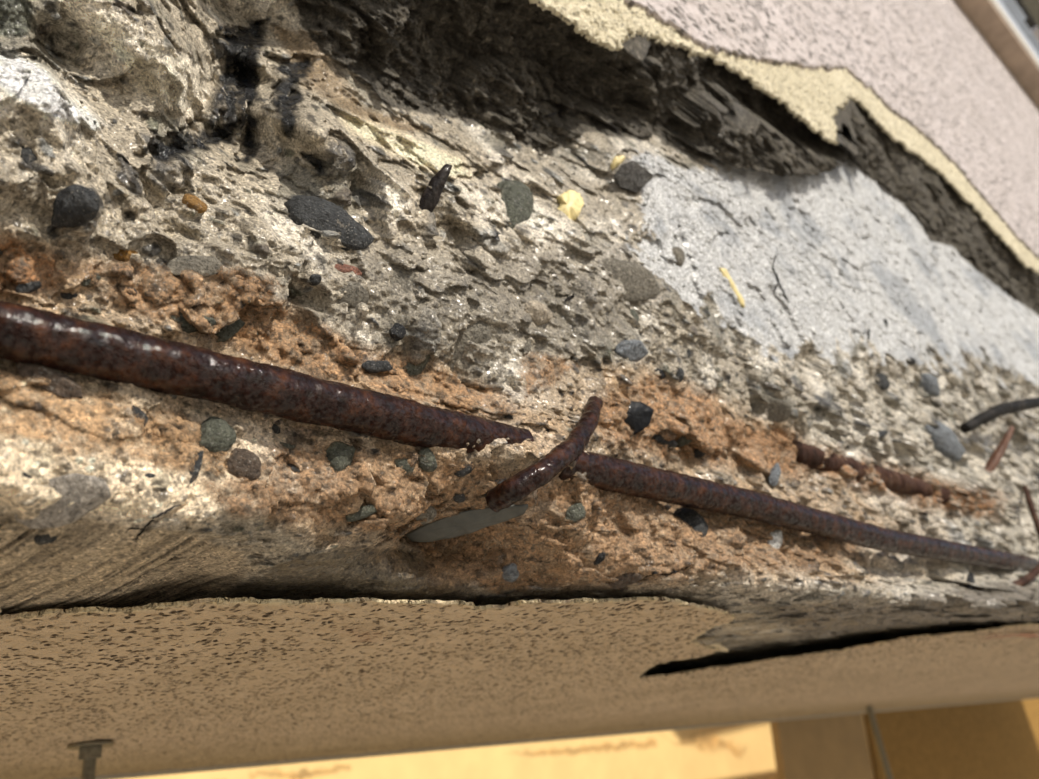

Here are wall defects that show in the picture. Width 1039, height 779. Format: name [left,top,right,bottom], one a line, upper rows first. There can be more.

corrosion [0,241,75,292]
corrosion [112,265,506,415]
corrosion [0,370,856,592]
spalling [0,0,1039,561]
spalling [0,358,1039,676]
corrosion [522,355,570,392]
corrosion [598,378,996,516]